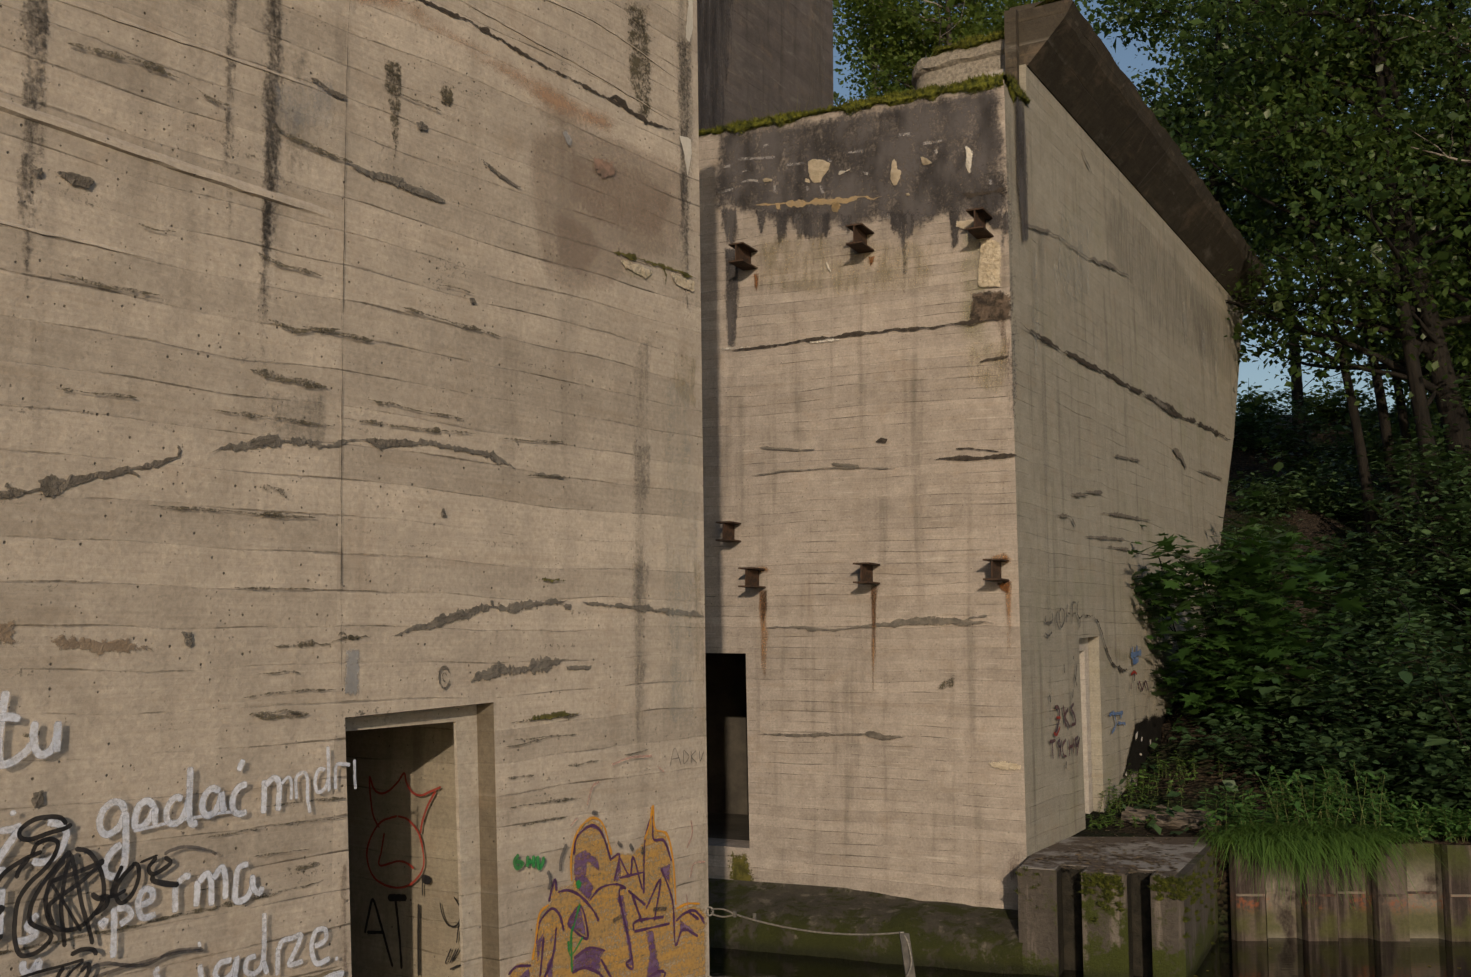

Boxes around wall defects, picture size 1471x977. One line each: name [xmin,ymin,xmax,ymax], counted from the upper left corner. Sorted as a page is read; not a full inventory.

leakage [18,0,48,208]
leakage [260,0,282,300]
leakage [886,211,914,273]
leakage [949,211,960,248]
leakage [985,97,1029,243]
crack [722,317,1231,440]
rust [759,590,767,671]
rust [998,581,1012,615]